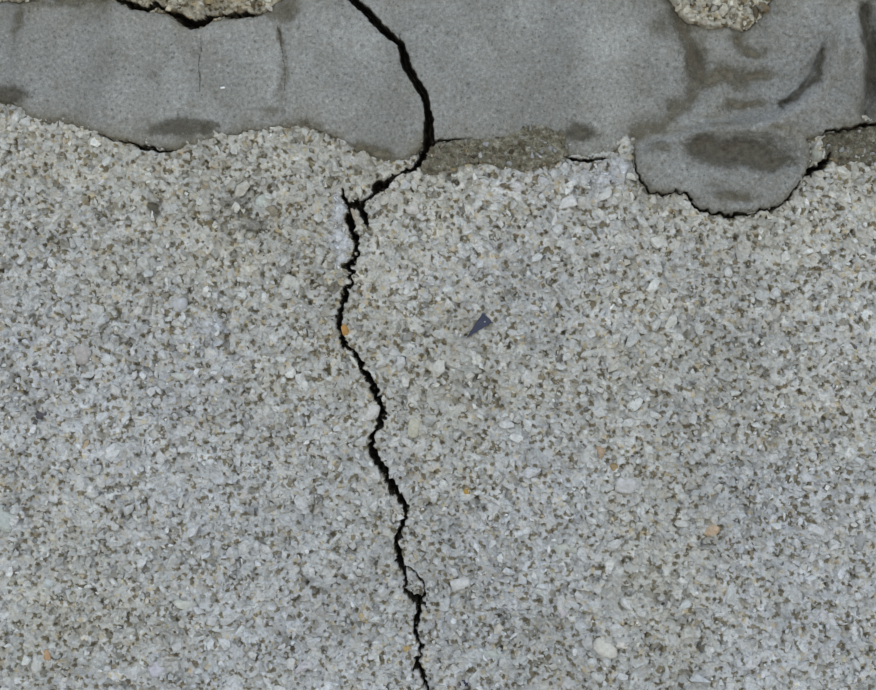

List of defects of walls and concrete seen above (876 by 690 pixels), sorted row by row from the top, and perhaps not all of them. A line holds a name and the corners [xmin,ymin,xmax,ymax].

crack [335,0,461,690]